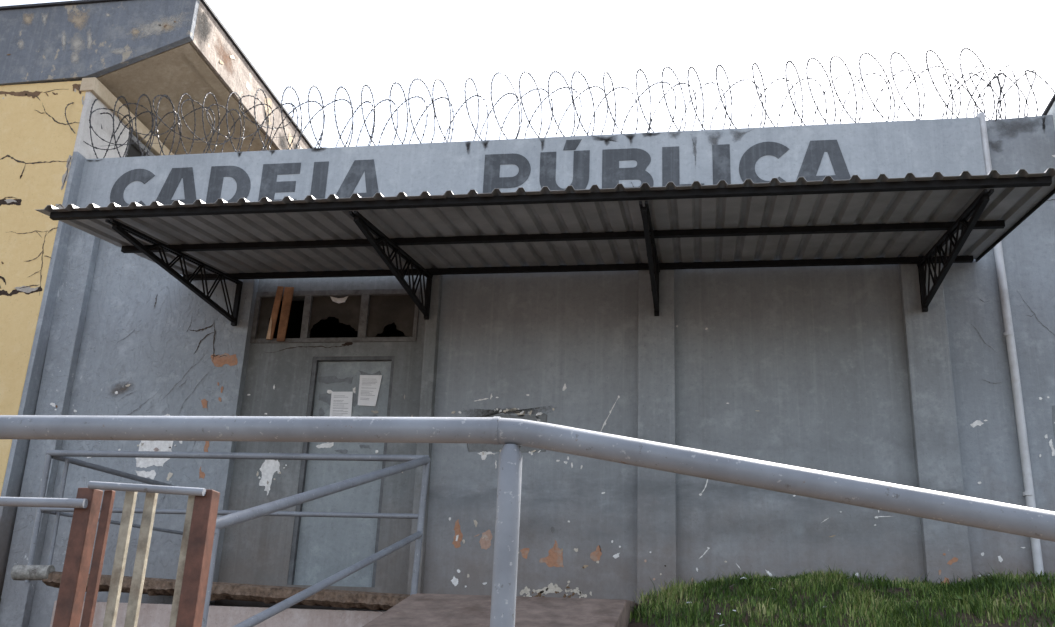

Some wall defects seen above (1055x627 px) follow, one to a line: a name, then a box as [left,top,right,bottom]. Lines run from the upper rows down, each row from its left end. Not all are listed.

crack [36,103,78,125]
crack [1,155,67,173]
crack [0,197,22,206]
crack [0,227,59,296]
crack [120,319,216,416]
flaking render [211,353,238,367]
peeling [482,408,554,421]
peeling [135,441,182,481]
peeling [256,460,287,495]
flaking render [449,517,493,550]
flaking render [518,527,621,568]